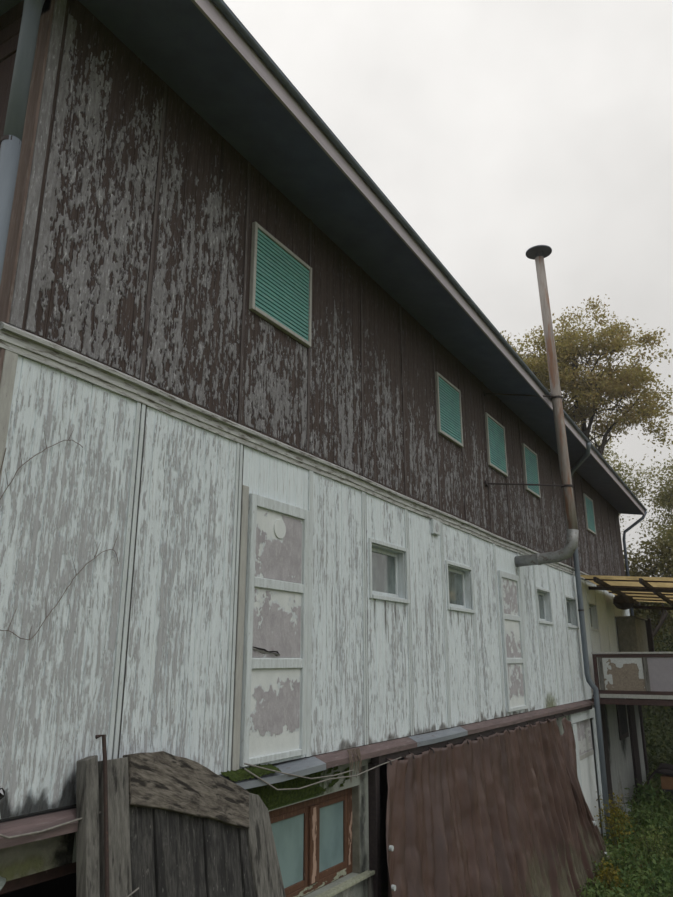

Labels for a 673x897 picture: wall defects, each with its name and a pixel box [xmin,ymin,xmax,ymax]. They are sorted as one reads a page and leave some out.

peeling [0,365,135,819]
peeling [26,14,621,774]
damp [388,722,464,741]
peeling [602,658,645,690]